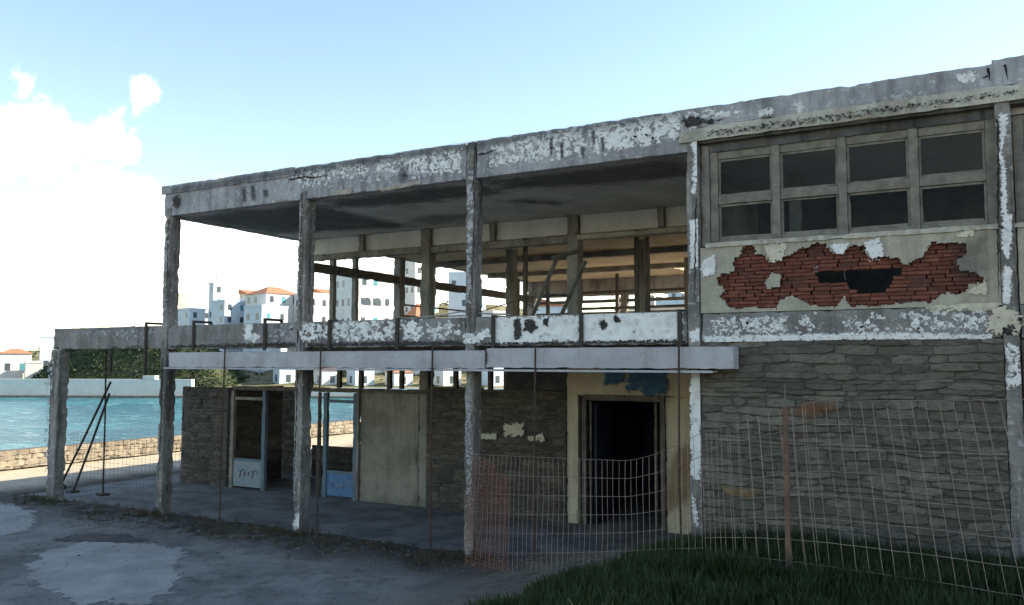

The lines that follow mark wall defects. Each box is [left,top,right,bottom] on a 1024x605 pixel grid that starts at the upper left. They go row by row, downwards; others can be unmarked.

flaking render [169,113,1024,390]
peeling [483,71,1019,195]